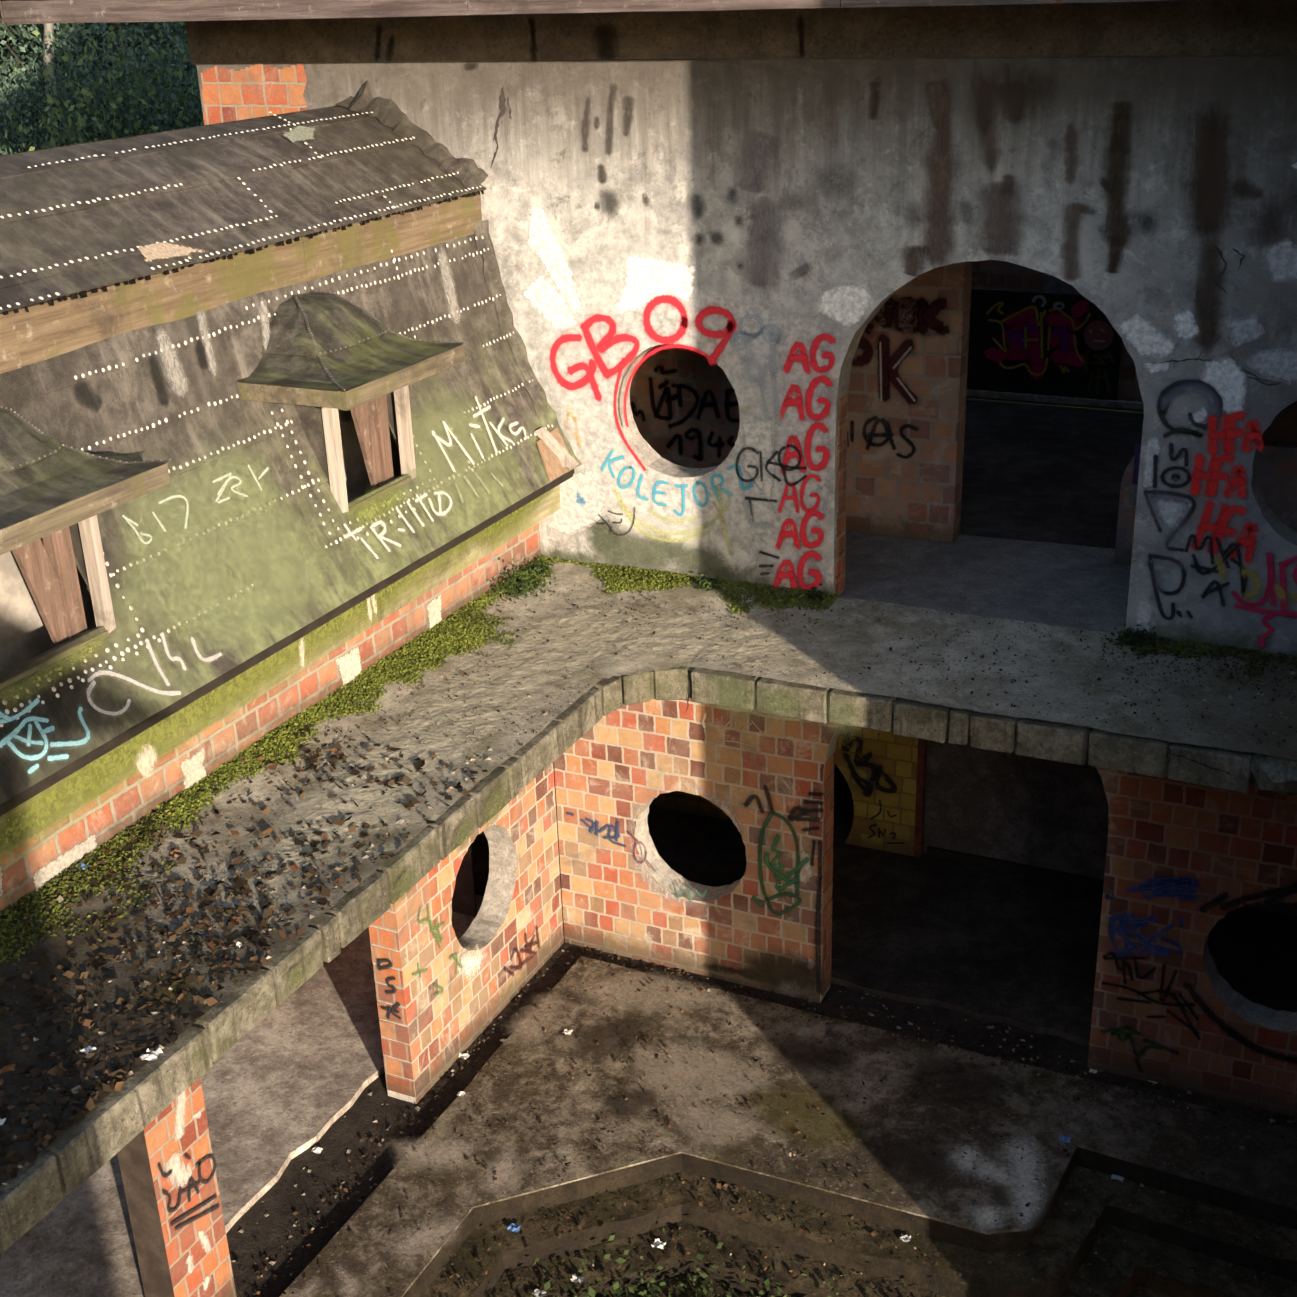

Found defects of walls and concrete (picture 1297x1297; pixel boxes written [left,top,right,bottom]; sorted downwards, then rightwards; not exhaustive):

crack [490,88,512,169]
water stain [582,86,633,215]
water stain [904,79,1046,276]
water stain [1065,101,1152,280]
water stain [1193,109,1281,351]
spalling [1250,737,1297,797]